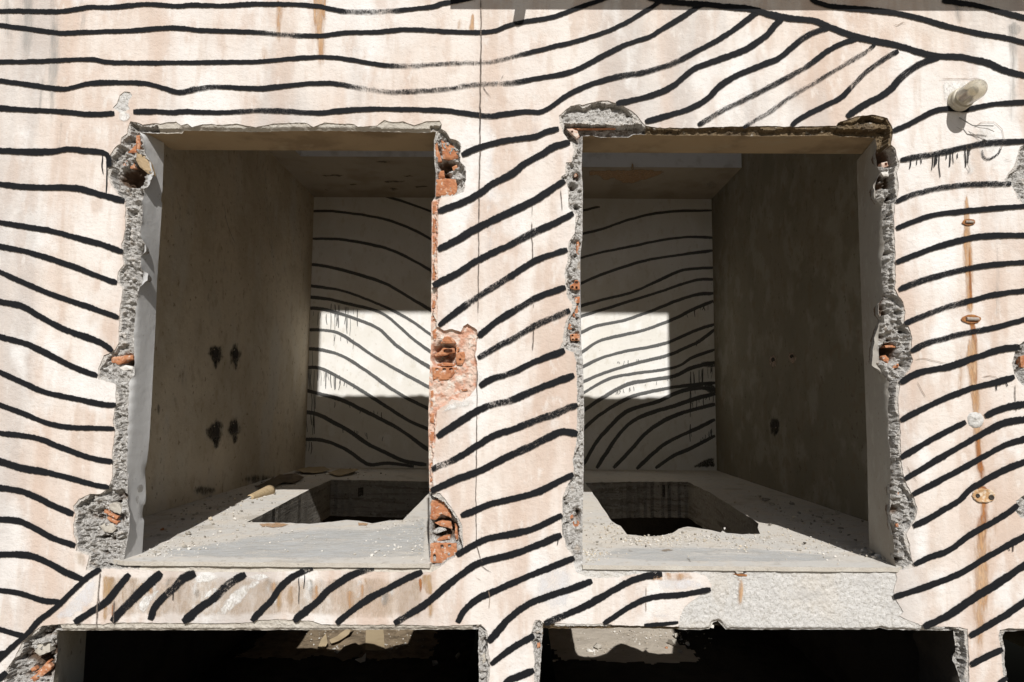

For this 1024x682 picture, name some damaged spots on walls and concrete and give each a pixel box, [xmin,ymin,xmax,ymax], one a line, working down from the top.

corrosion [314,0,326,55]
spalling [5,92,490,682]
crack [475,371,490,606]
spalling [531,101,969,682]
corrosion [964,197,980,413]
corrosion [974,428,987,489]
corrosion [976,503,988,643]